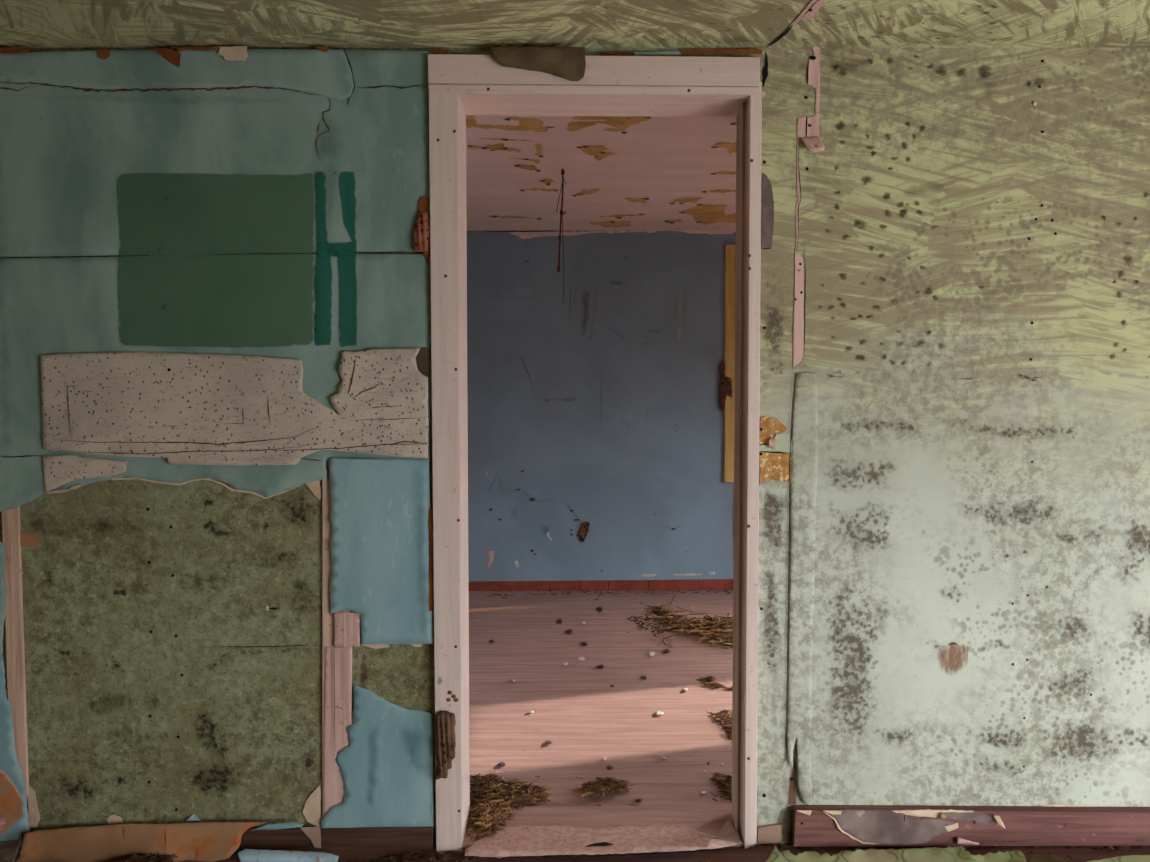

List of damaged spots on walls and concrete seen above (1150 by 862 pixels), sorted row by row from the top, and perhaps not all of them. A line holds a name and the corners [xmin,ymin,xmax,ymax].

crack [767,25,793,48]
peeling [567,116,651,134]
peeling [466,115,559,192]
peeling [576,145,617,161]
peeling [664,189,736,226]
peeling [759,416,792,484]
mould [764,494,782,547]
leakage [840,513,887,548]
mould [1123,523,1150,575]
mould [765,574,780,672]
mould [830,590,877,735]
mould [1051,728,1147,761]